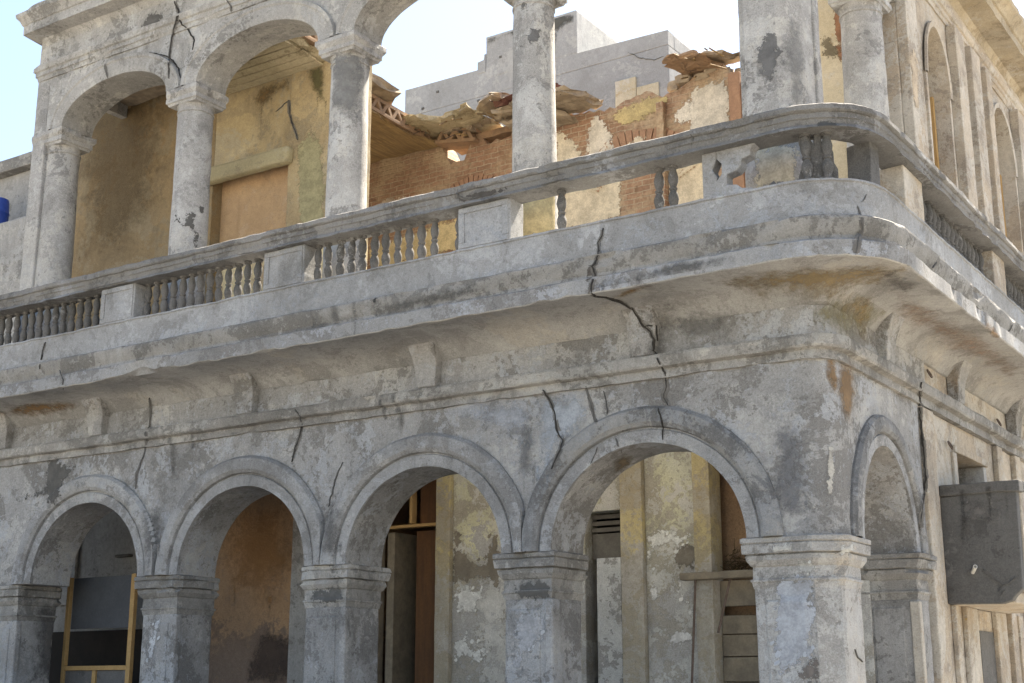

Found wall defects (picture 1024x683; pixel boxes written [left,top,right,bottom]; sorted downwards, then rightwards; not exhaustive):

crack [154,1,195,78]
peeling [556,96,668,161]
peeling [674,77,729,129]
flaking render [174,206,204,247]
crack [588,228,670,440]
crack [135,398,152,489]
crack [541,390,565,469]
crack [585,386,622,464]
crack [917,382,929,528]
peeling [453,531,501,616]
peeling [646,529,695,570]
peeling [453,630,488,664]